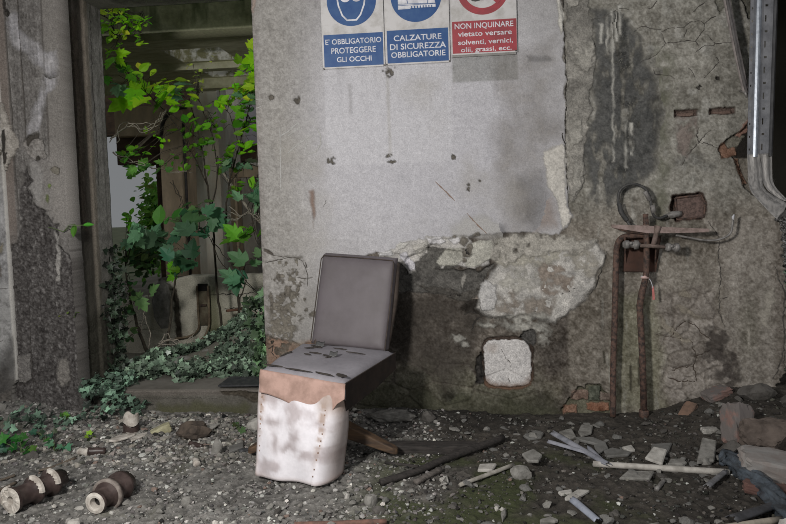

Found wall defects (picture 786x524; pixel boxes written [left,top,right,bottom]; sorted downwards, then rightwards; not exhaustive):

crack [634,1,731,78]
spalling [0,102,47,170]
peeling [543,0,597,229]
damp [583,4,660,204]
spalling [718,120,754,196]
spalling [11,170,80,411]
peeling [264,249,316,350]
spalling [378,232,496,301]
spalling [475,352,485,384]
peeling [479,312,549,345]
crack [656,221,727,382]
crack [773,267,786,378]